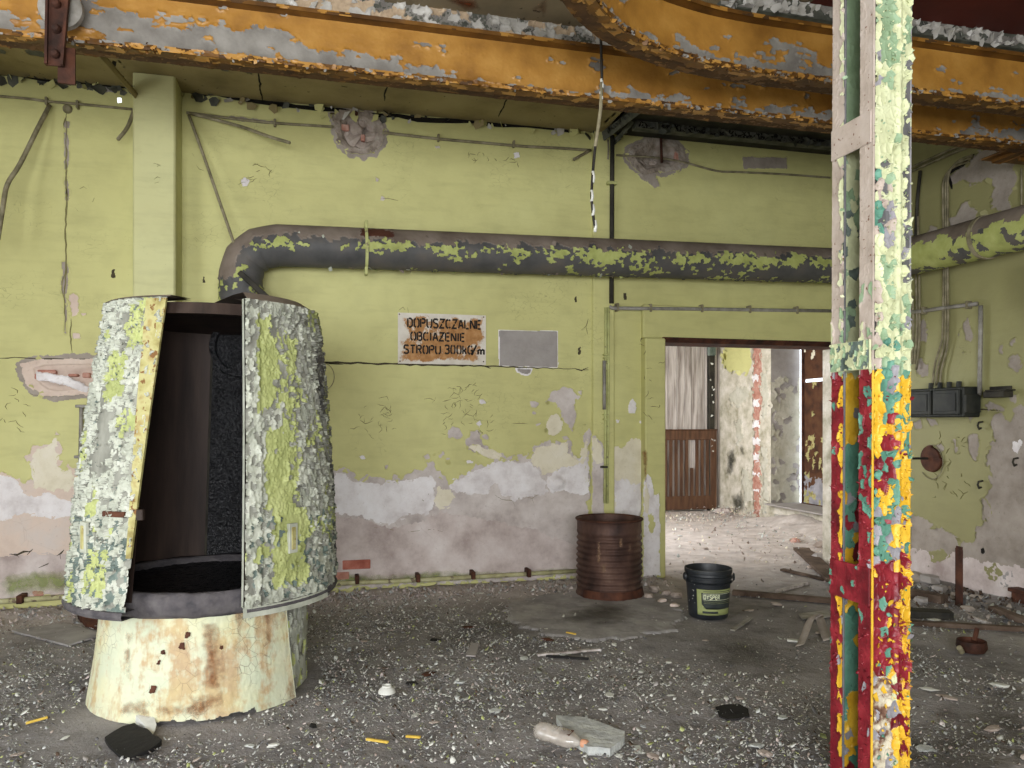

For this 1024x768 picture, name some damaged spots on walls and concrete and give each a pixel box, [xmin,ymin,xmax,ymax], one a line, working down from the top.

peeling [725,0,798,13]
peeling [610,16,848,84]
flaking render [327,108,390,161]
flaking render [607,123,689,189]
crack [324,361,587,439]
peeling [856,0,1024,768]
peeling [0,303,141,605]
peeling [329,385,662,592]
peeling [829,376,844,559]